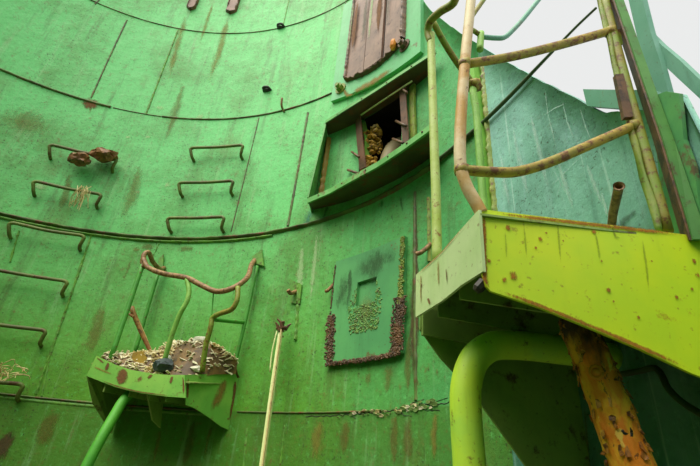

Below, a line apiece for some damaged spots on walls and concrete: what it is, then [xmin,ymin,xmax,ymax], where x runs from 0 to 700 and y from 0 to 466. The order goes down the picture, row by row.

rust [508,214,672,234]
rust [482,218,490,285]
rust [508,293,676,363]
rust [95,358,163,395]
rust [213,381,236,417]